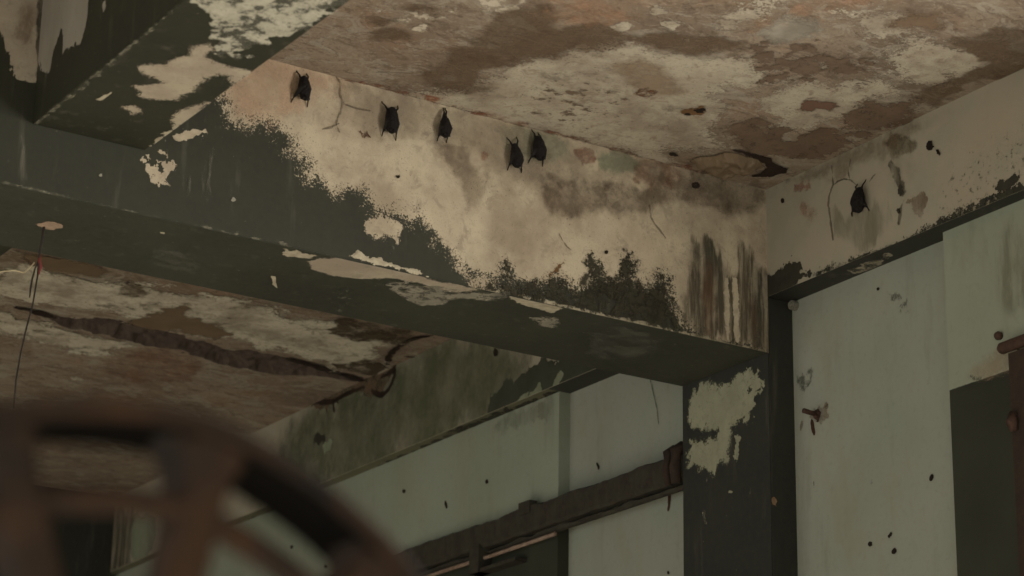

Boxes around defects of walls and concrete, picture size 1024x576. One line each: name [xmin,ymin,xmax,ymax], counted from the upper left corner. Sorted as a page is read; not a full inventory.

flaking render [0,0,89,83]
water stain [371,18,410,40]
water stain [424,5,746,94]
water stain [916,27,1024,102]
peeling [118,0,989,353]
water stain [480,158,1024,352]
flaking render [0,262,403,382]
crack [312,335,434,413]
peeling [685,367,765,478]